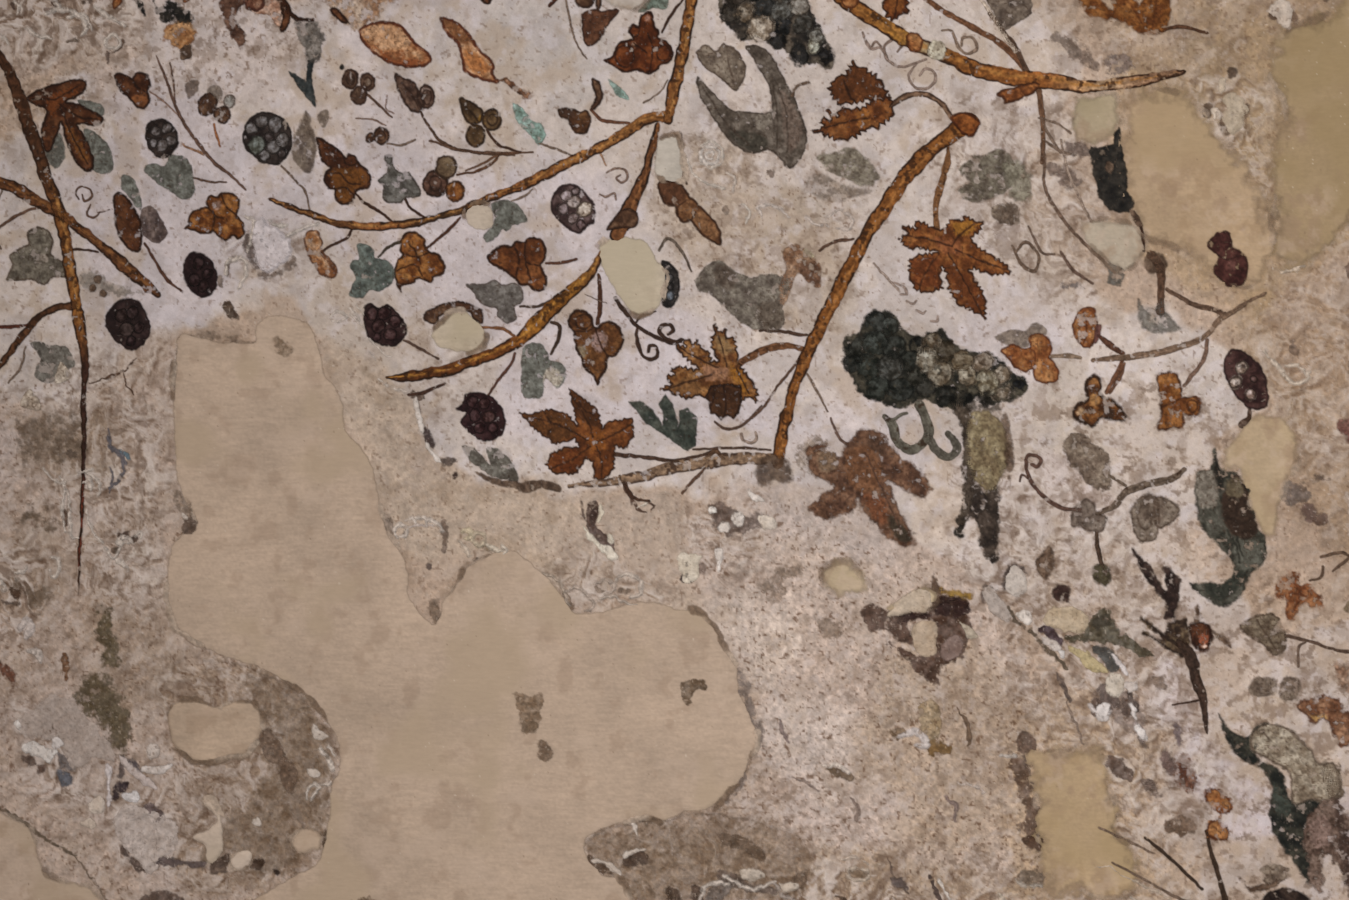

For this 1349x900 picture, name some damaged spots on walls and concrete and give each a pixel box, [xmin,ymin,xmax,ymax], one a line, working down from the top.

flaking render [1082,0,1349,289]
flaking render [432,307,489,356]
flaking render [1224,415,1328,535]
flaking render [677,489,777,583]
flaking render [80,315,761,900]
flaking render [823,558,1182,775]
flaking render [0,811,102,900]
flaking render [666,833,807,900]
flaking render [1009,731,1162,900]
flaking render [1165,815,1196,837]